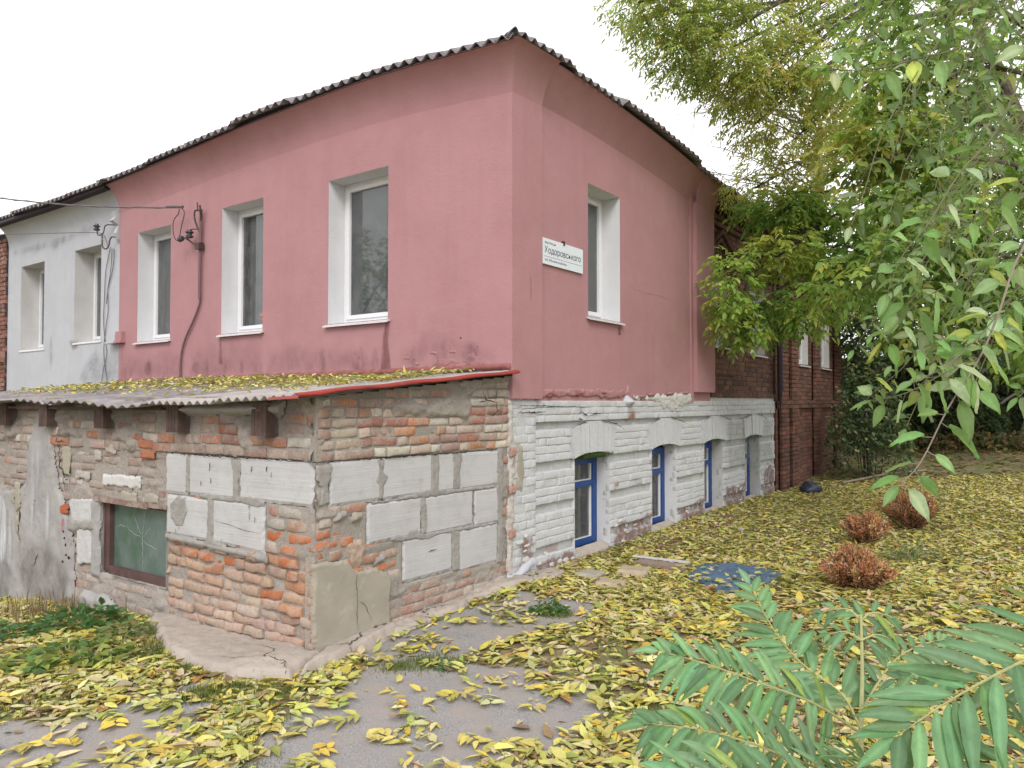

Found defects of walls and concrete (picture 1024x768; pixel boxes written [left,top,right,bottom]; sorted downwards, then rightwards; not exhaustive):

crack [480,389,623,428]
flaking render [542,388,692,412]
spalling [60,503,70,563]
peeling [612,513,652,545]